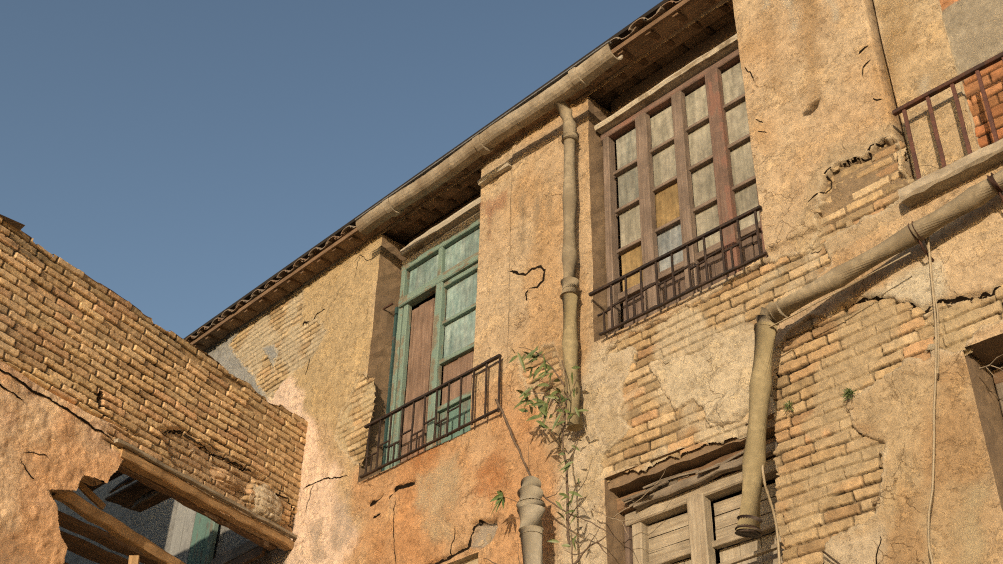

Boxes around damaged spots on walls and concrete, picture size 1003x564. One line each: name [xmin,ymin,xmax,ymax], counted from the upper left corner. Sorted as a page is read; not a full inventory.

crack [509,262,546,300]
spalling [601,139,915,483]
crack [852,286,1003,315]
crack [0,368,113,441]
crack [162,430,253,484]
spalling [337,375,376,467]
crack [370,482,415,563]
crack [435,520,497,564]